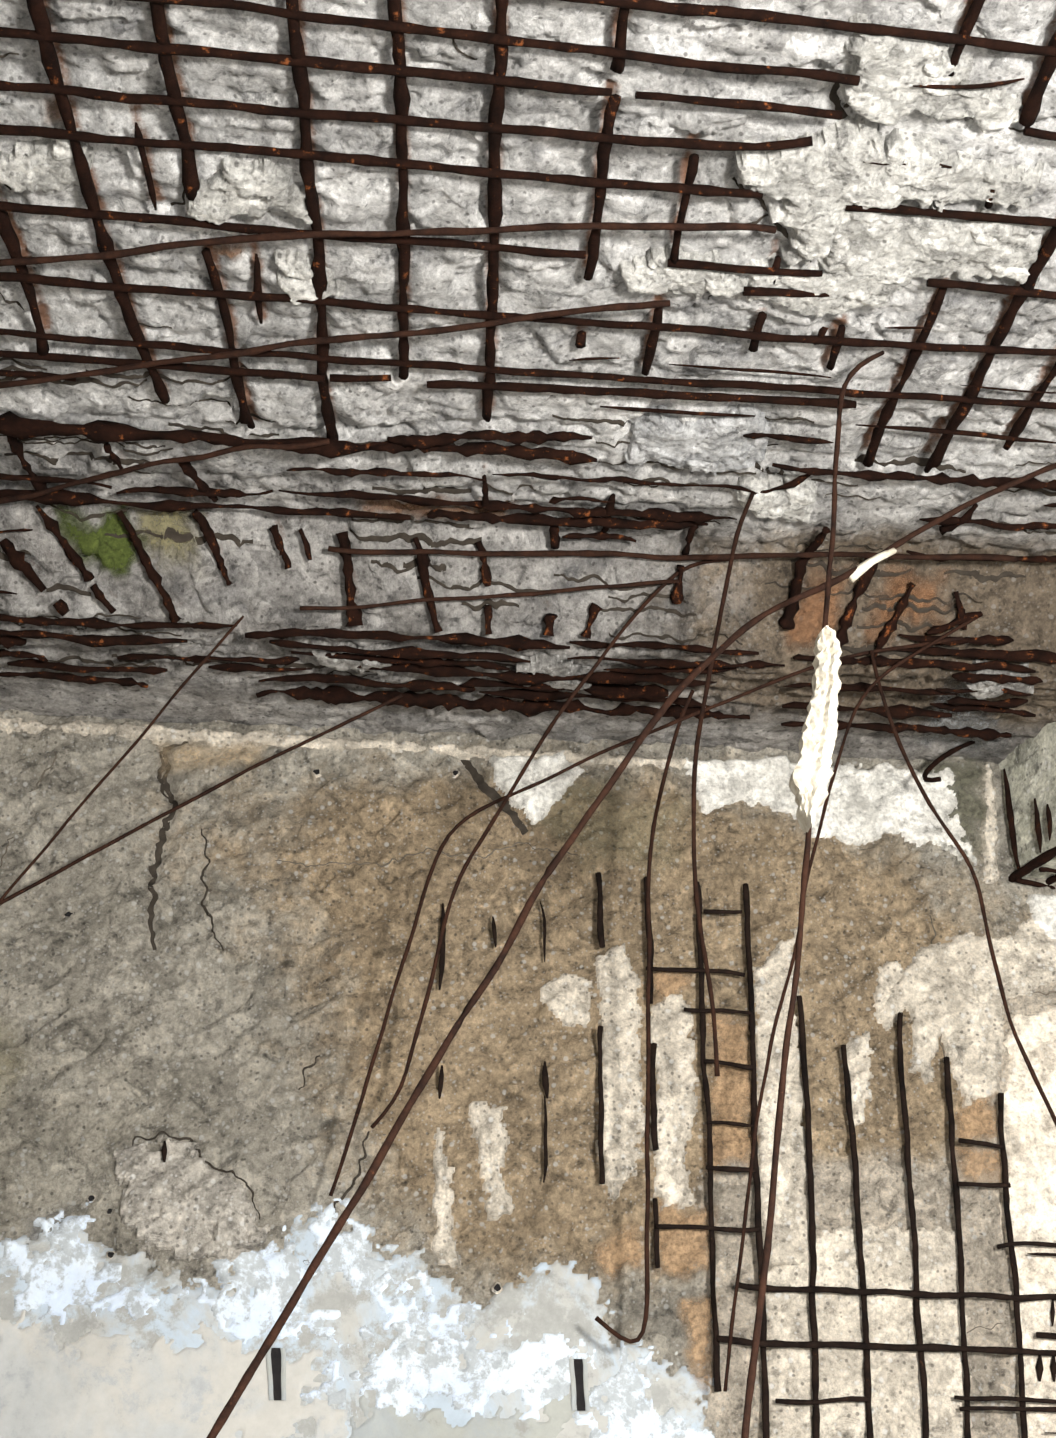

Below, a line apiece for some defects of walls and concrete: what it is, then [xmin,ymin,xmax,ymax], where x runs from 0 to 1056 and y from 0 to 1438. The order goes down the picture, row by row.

spalling [0,13,1045,389]
corrosion [789,586,838,642]
crack [147,741,224,951]
peeling [0,350,1056,1438]